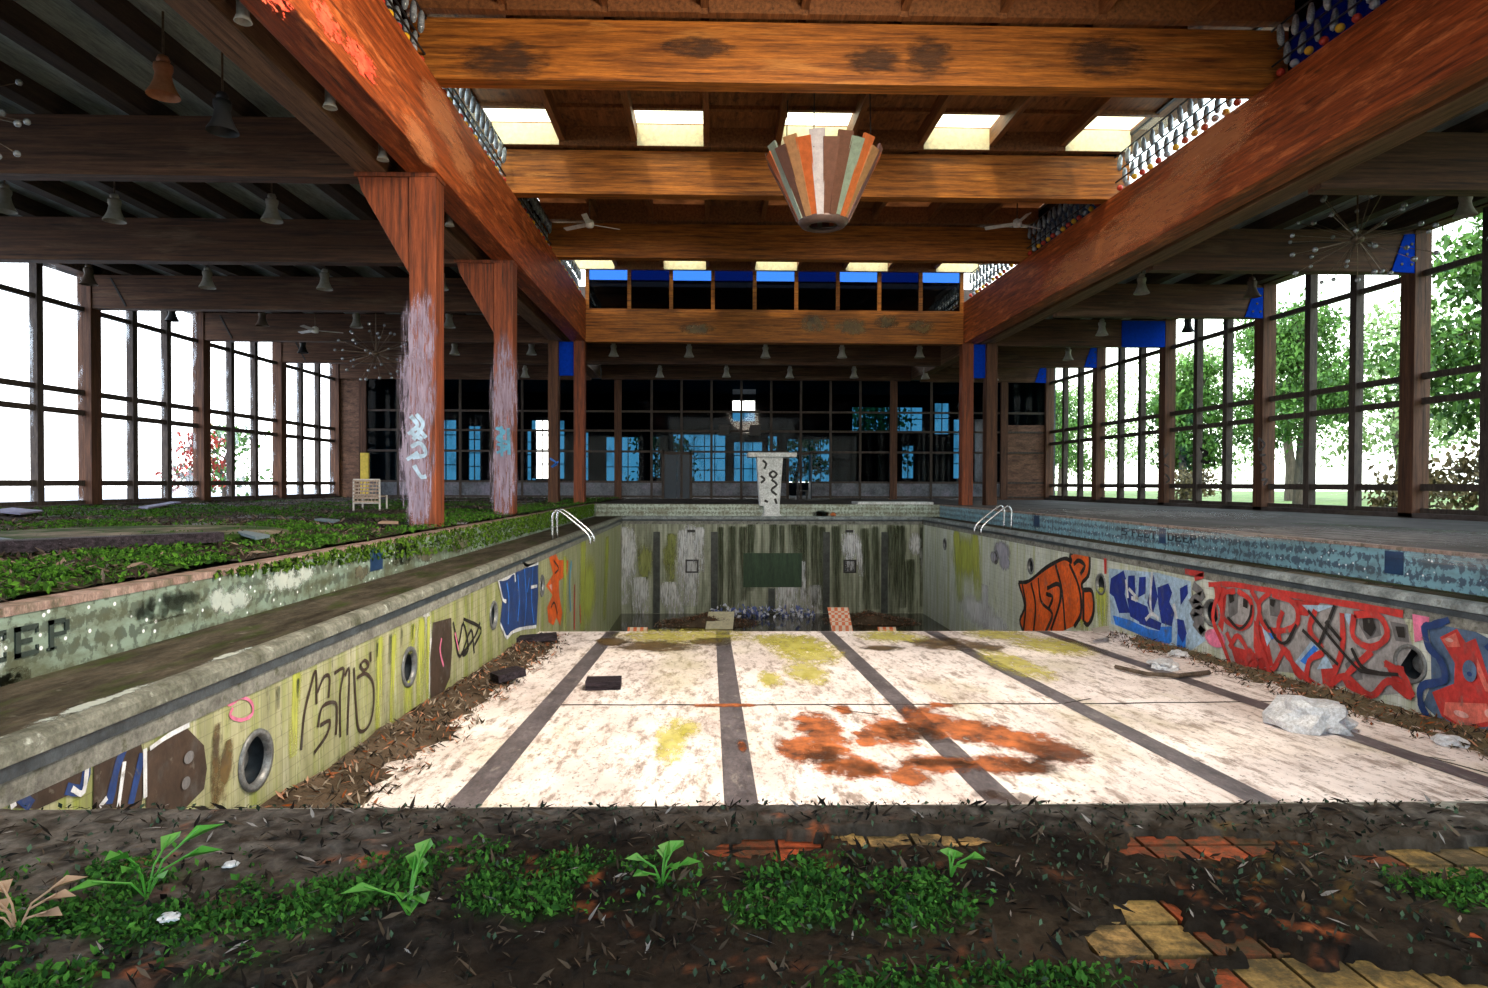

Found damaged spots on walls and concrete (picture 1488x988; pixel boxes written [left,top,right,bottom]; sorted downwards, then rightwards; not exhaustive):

peeling [399,300,435,525]
peeling [490,341,517,515]
leakage [563,524,923,652]
corrosion [776,702,1092,802]